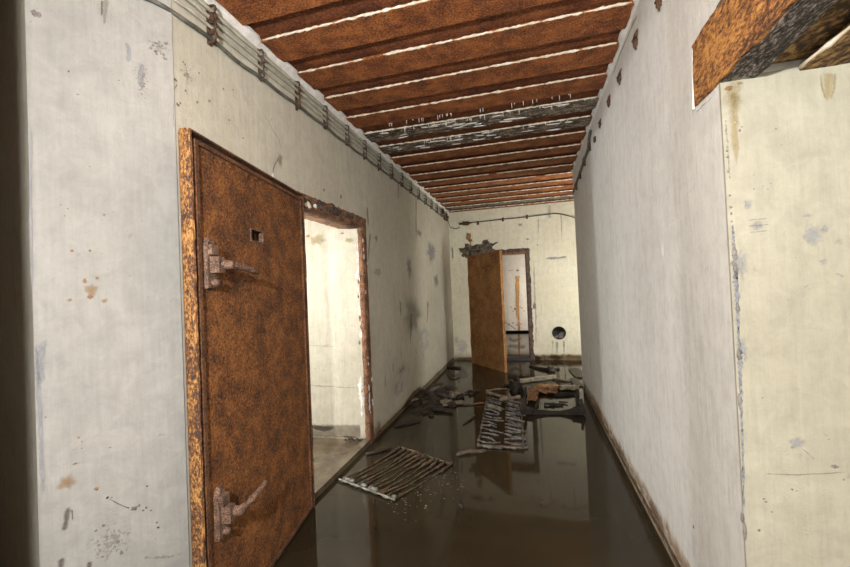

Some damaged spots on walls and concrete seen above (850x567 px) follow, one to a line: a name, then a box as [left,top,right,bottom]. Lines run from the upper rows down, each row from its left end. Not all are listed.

spalling [452,240,499,258]
spalling [729,194,747,541]
water stain [583,383,688,567]